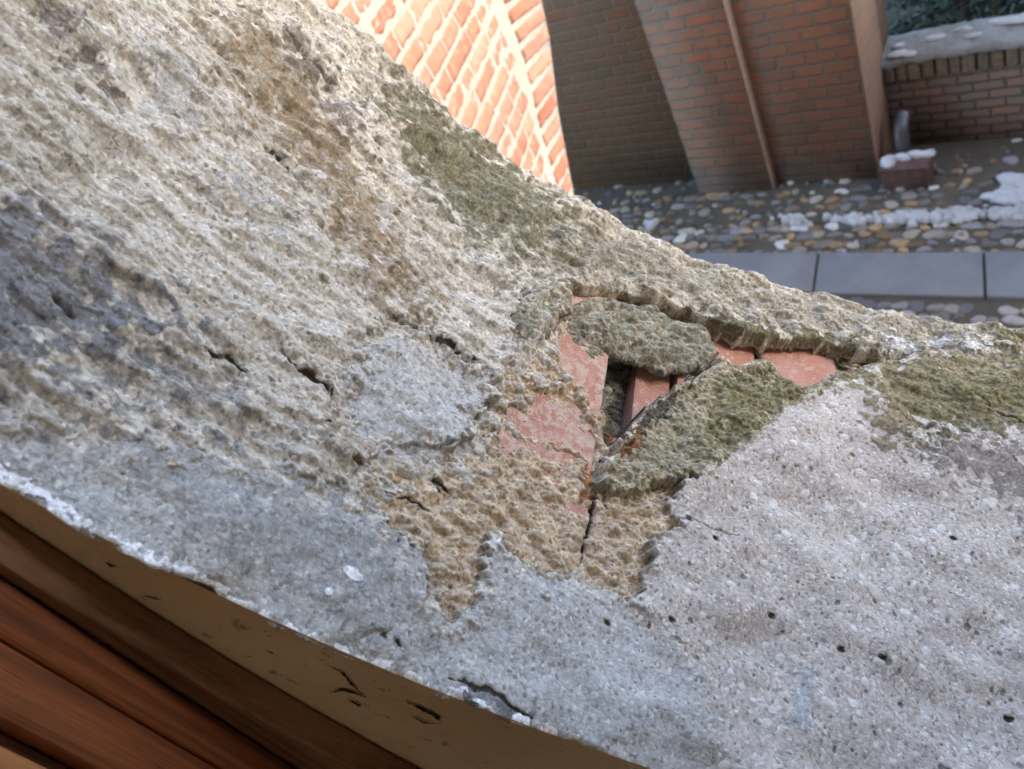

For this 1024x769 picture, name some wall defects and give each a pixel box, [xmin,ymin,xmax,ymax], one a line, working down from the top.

crack [208,350,246,373]
spalling [333,283,885,623]
crack [580,458,607,560]